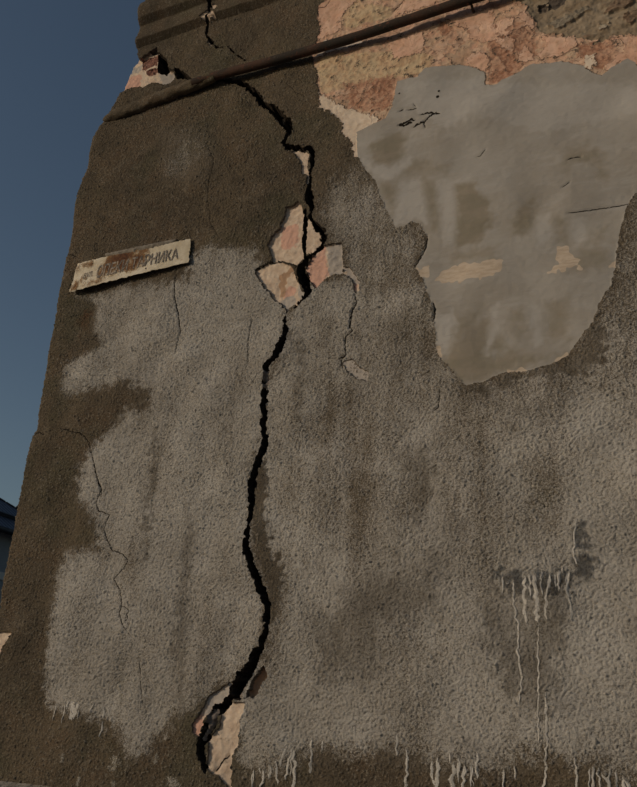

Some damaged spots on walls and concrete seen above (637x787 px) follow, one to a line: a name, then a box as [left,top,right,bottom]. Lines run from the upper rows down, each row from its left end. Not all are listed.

crack [205,0,249,61]
spalling [125,47,192,89]
peeling [311,0,637,158]
crack [399,105,440,128]
corrosion [69,248,150,292]
spalling [255,200,360,312]
crack [195,78,328,774]
water stain [486,519,579,787]
spalling [191,665,267,787]
water stain [251,749,297,787]
water stain [430,753,479,787]
water stain [588,767,631,787]